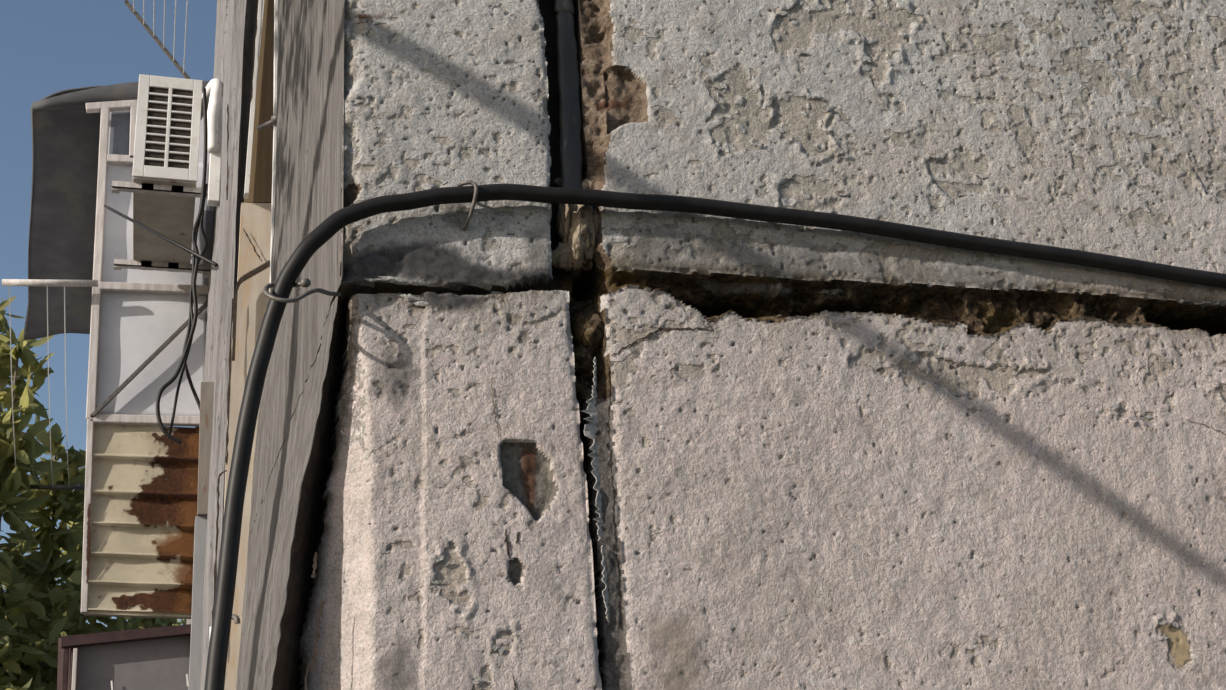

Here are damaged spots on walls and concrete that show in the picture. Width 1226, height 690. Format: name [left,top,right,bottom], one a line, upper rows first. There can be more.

spalling [537,0,561,187]
spalling [573,0,648,190]
corrosion [596,100,627,110]
leakage [341,243,552,310]
spalling [550,203,618,302]
spalling [691,302,765,318]
spalling [1146,309,1226,336]
corrosion [111,426,199,613]
spalling [500,441,559,521]
peeling [1155,618,1192,670]